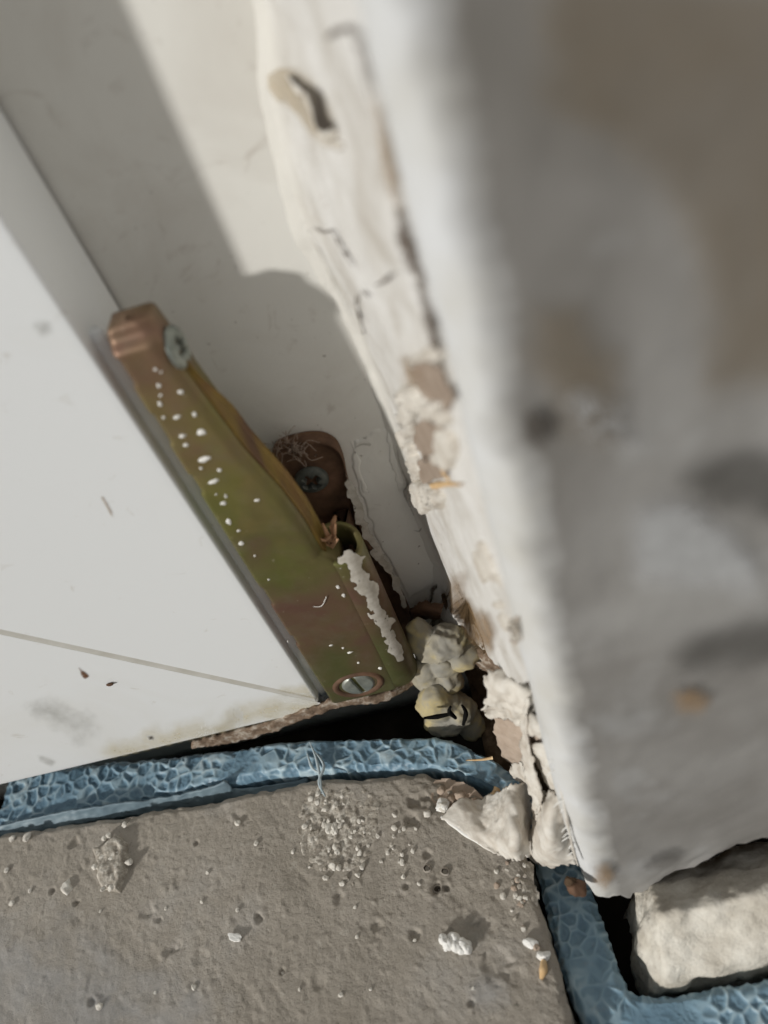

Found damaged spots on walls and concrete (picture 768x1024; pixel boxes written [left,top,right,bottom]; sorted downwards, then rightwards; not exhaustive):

spalling [269,70,345,151]
peeling [350,344,460,621]
spalling [492,600,523,645]
peeling [424,648,579,961]